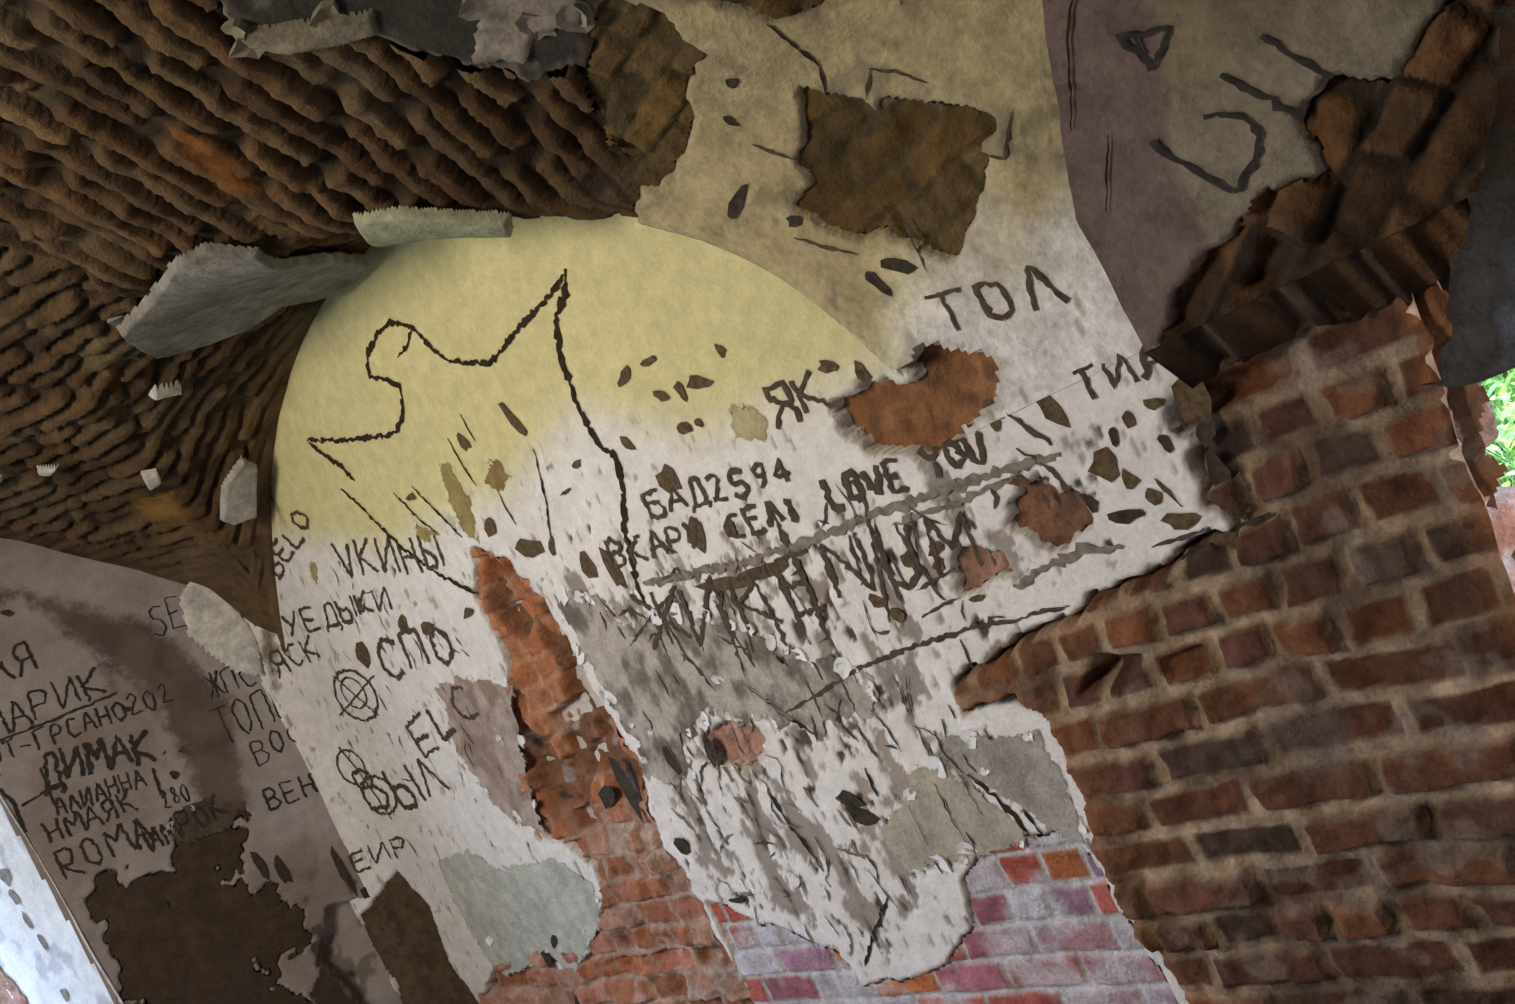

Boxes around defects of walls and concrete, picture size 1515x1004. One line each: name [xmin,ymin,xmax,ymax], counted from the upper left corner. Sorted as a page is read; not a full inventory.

spalling [0,0,705,651]
spalling [330,0,1515,1004]
spalling [0,969,29,1004]
flaking render [0,869,48,951]
spalling [86,799,313,1004]